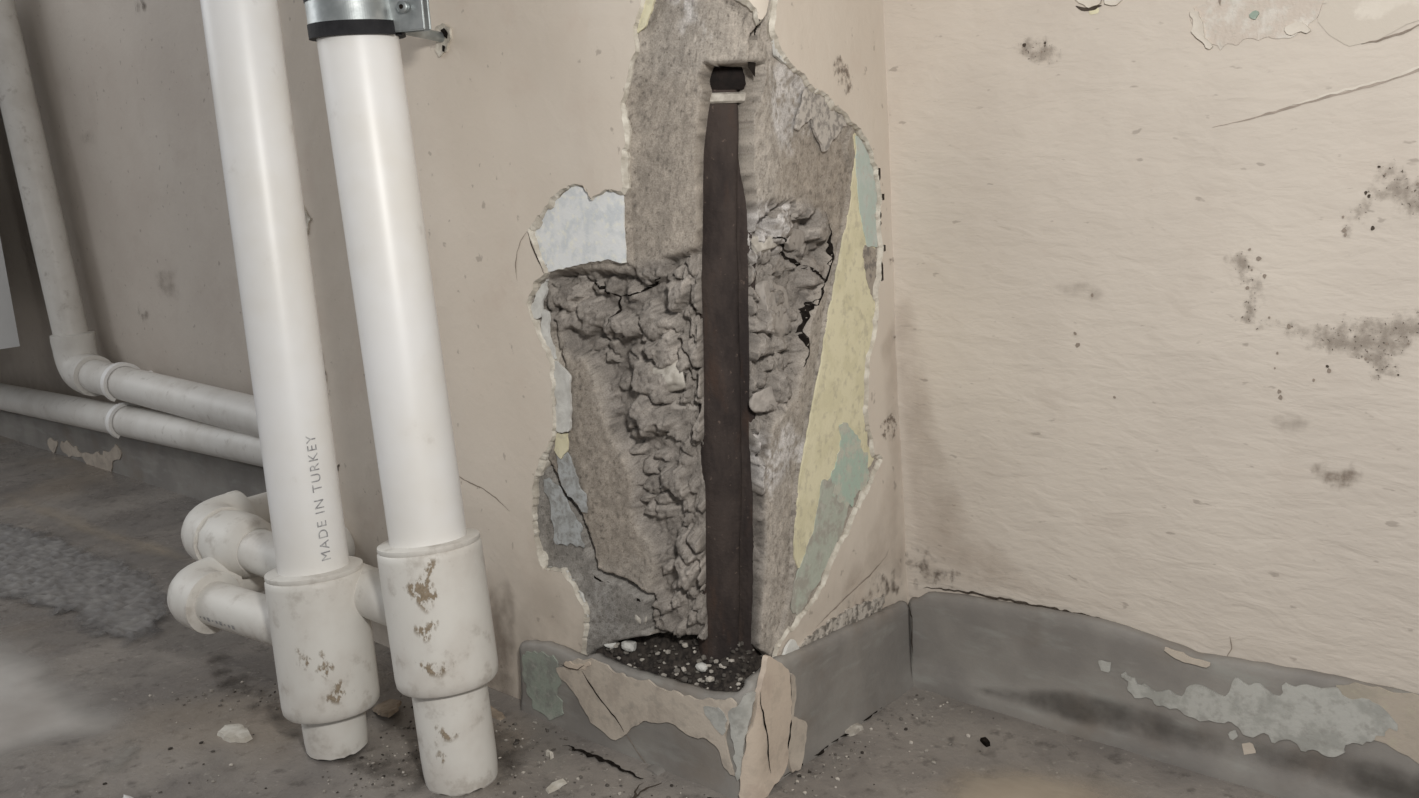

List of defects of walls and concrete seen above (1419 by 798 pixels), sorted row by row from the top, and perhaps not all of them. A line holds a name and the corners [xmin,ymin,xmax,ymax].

peeling [1076,0,1122,15]
leakage [1341,166,1419,237]
crack [595,278,660,326]
crack [773,212,834,367]
spalling [522,0,885,776]
rust [697,67,758,662]
leakage [1312,321,1419,382]
peeling [47,438,122,472]
crack [760,677,792,772]